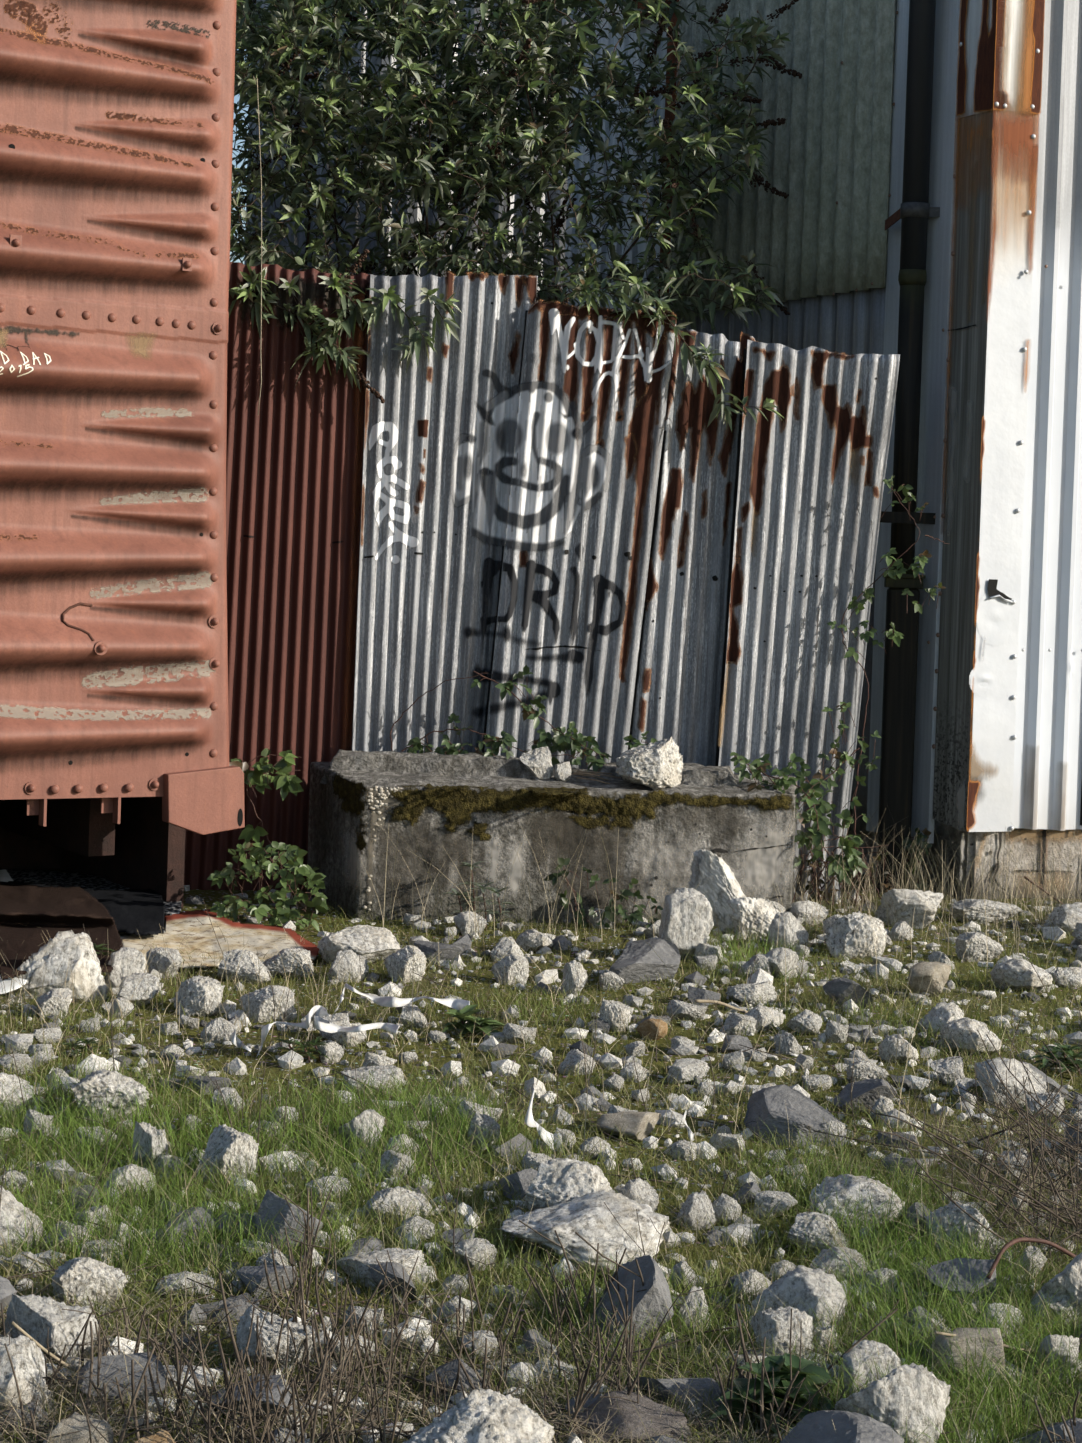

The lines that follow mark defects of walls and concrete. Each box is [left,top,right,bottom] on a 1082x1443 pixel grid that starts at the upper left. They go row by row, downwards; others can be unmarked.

corrosion [942,0,1045,521]
corrosion [237,276,372,751]
corrosion [445,271,879,745]
corrosion [958,747,993,830]